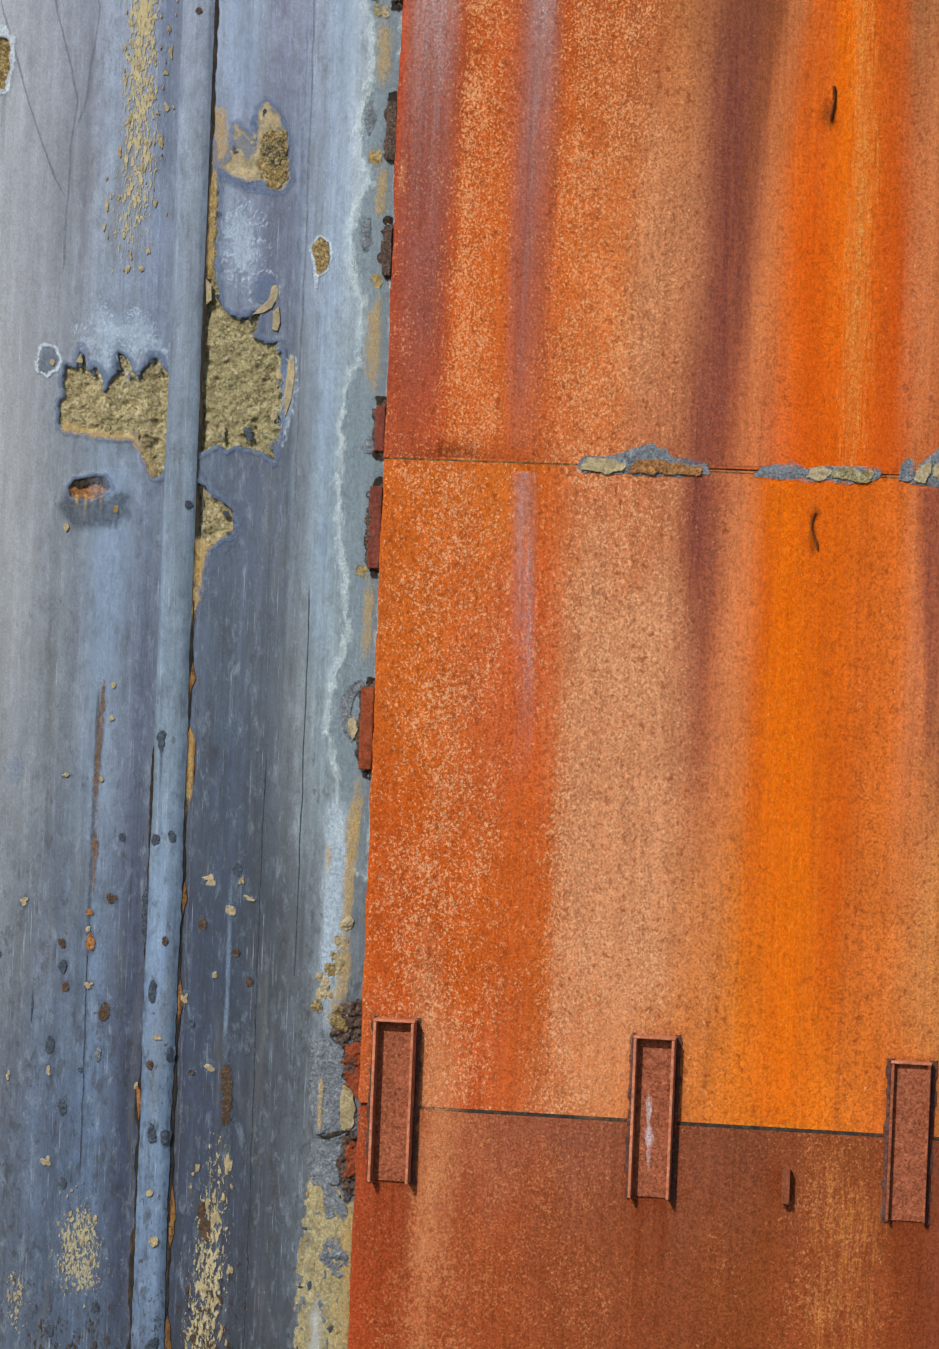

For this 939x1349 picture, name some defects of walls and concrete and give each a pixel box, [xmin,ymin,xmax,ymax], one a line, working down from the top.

spalling [0,26,15,94]
peeling [103,0,181,273]
spalling [200,101,291,460]
spalling [50,353,169,478]
peeling [577,443,710,477]
peeling [753,461,882,485]
peeling [899,448,939,487]
spalling [185,484,234,610]
peeling [180,1132,234,1349]
peeling [294,1037,357,1349]